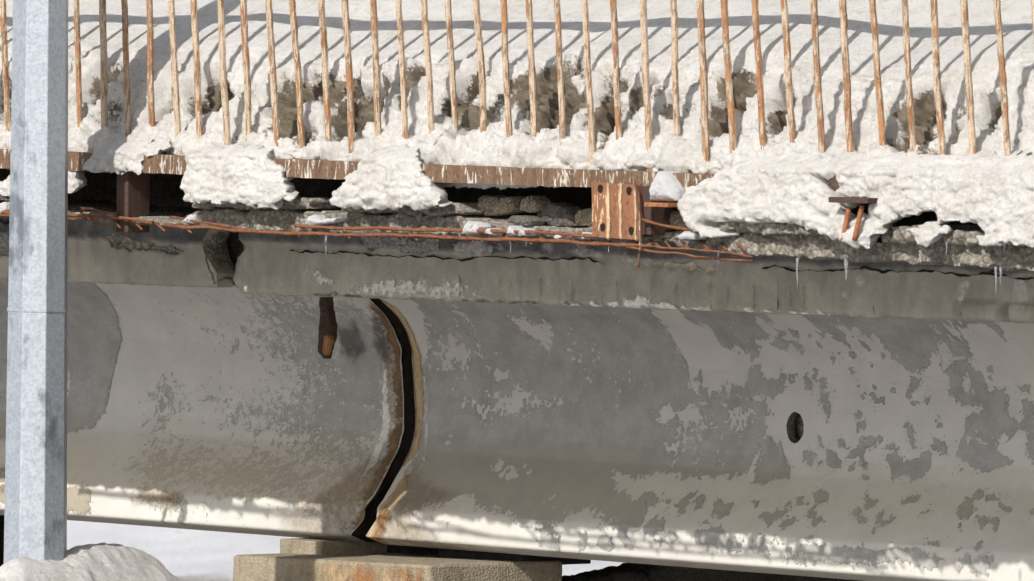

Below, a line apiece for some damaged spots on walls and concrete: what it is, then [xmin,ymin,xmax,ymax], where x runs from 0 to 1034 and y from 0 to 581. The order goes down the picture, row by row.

spalling [0,232,9,257]
rust [605,183,637,239]
spalling [717,221,820,235]
spalling [882,225,920,245]
spalling [935,225,985,246]
peeling [0,279,8,441]
peeling [67,282,122,433]
peeling [398,297,1034,577]
peeling [67,481,93,515]